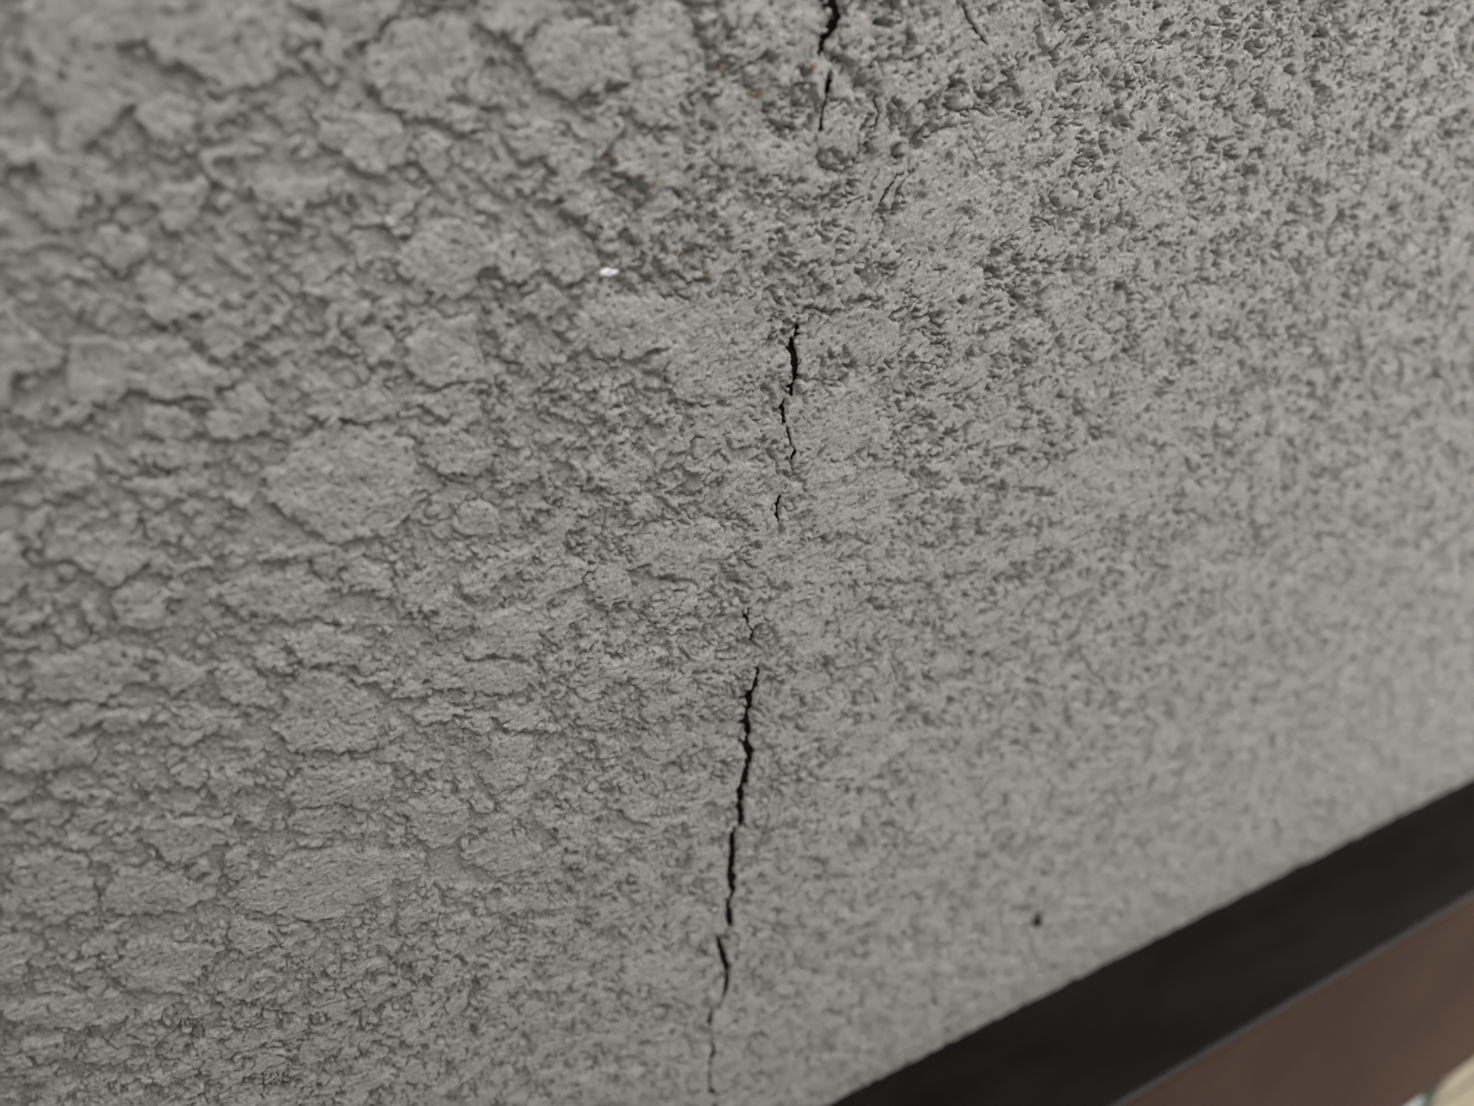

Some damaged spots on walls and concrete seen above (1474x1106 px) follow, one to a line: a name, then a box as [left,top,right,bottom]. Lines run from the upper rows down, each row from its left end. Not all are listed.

crack [817,0,845,130]
crack [779,324,801,459]
crack [773,496,781,522]
crack [705,608,763,1106]